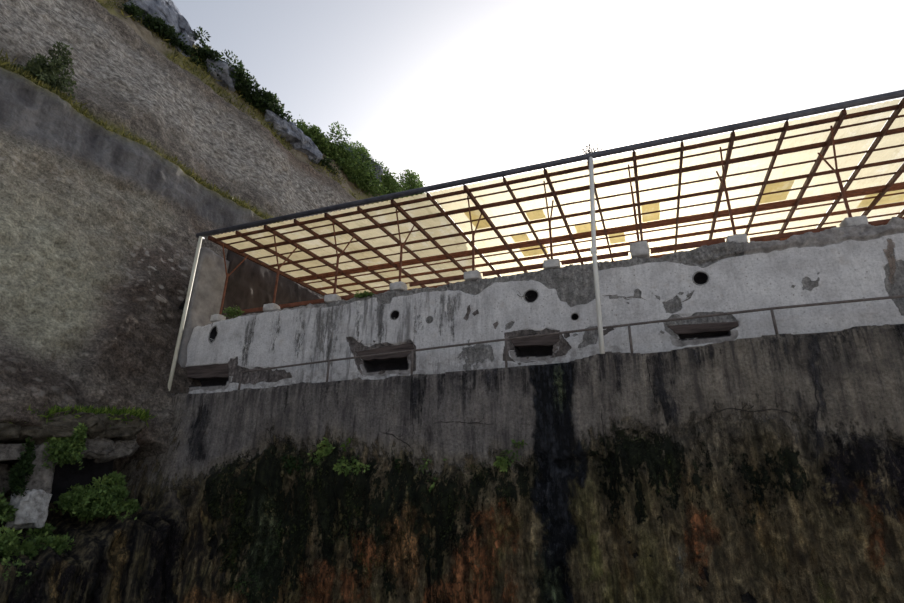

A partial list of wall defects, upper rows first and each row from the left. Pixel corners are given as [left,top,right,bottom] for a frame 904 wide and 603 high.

damp [242,318,256,360]
spalling [228,357,292,385]
damp [316,305,343,365]
spalling [315,241,745,321]
spalling [457,321,614,371]
damp [648,350,679,425]
spalling [655,290,739,340]
spalling [792,273,820,290]
spalling [884,249,904,316]
damp [762,334,904,521]
damp [438,362,811,603]
rust [352,499,519,603]